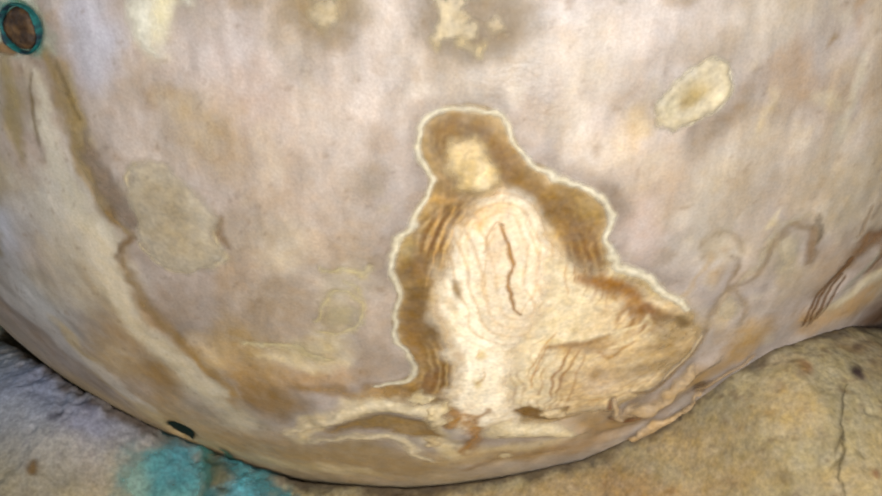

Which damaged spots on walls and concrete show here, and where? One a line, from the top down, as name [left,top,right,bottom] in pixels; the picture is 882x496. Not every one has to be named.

corrosion [0,6,36,145]
peeling [431,0,486,57]
corrosion [44,51,138,247]
crack [501,227,515,310]
spalling [608,332,755,442]